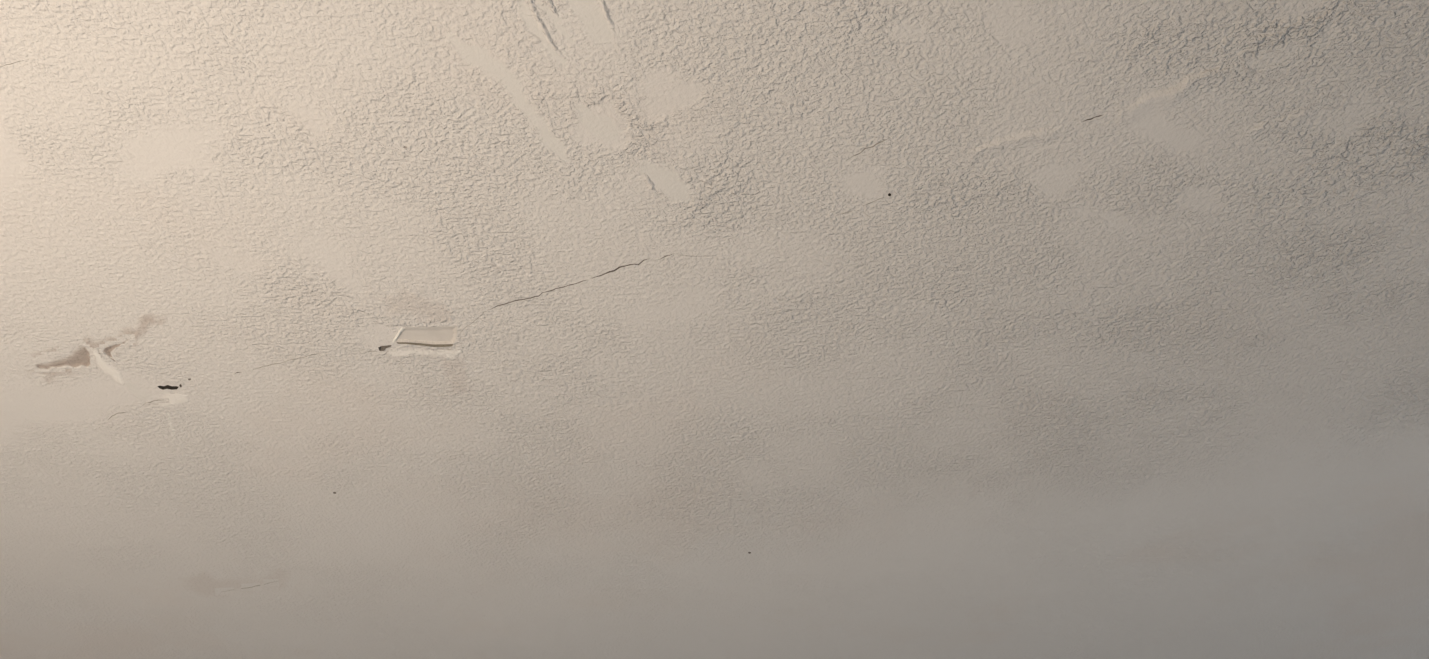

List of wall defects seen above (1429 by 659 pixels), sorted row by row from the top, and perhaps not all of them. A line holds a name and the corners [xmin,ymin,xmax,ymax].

crack [460,253,697,333]
spalling [24,311,173,385]
spalling [378,326,463,359]